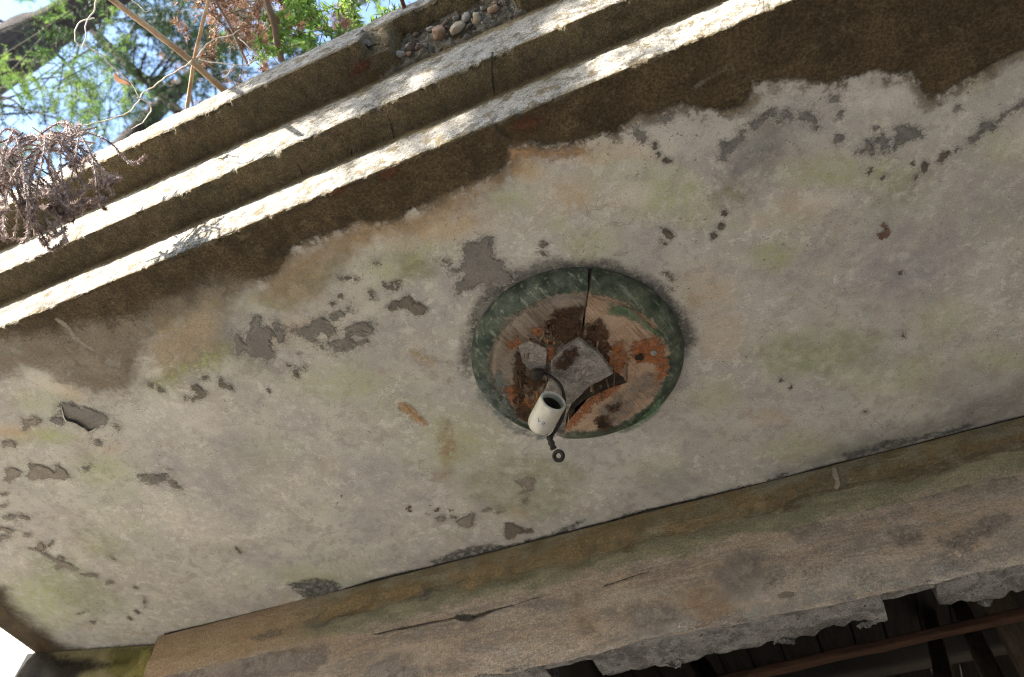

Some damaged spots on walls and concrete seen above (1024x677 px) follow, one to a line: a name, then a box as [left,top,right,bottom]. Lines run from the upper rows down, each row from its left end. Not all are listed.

peeling [717,96,925,182]
damp [0,0,1024,393]
peeling [441,234,515,325]
peeling [232,274,428,379]
peeling [0,400,120,448]
peeling [0,459,113,585]
damp [288,578,431,629]
crack [365,594,549,636]
peeling [425,505,534,540]
damp [431,521,636,590]
damp [628,514,1011,643]
damp [165,648,326,677]